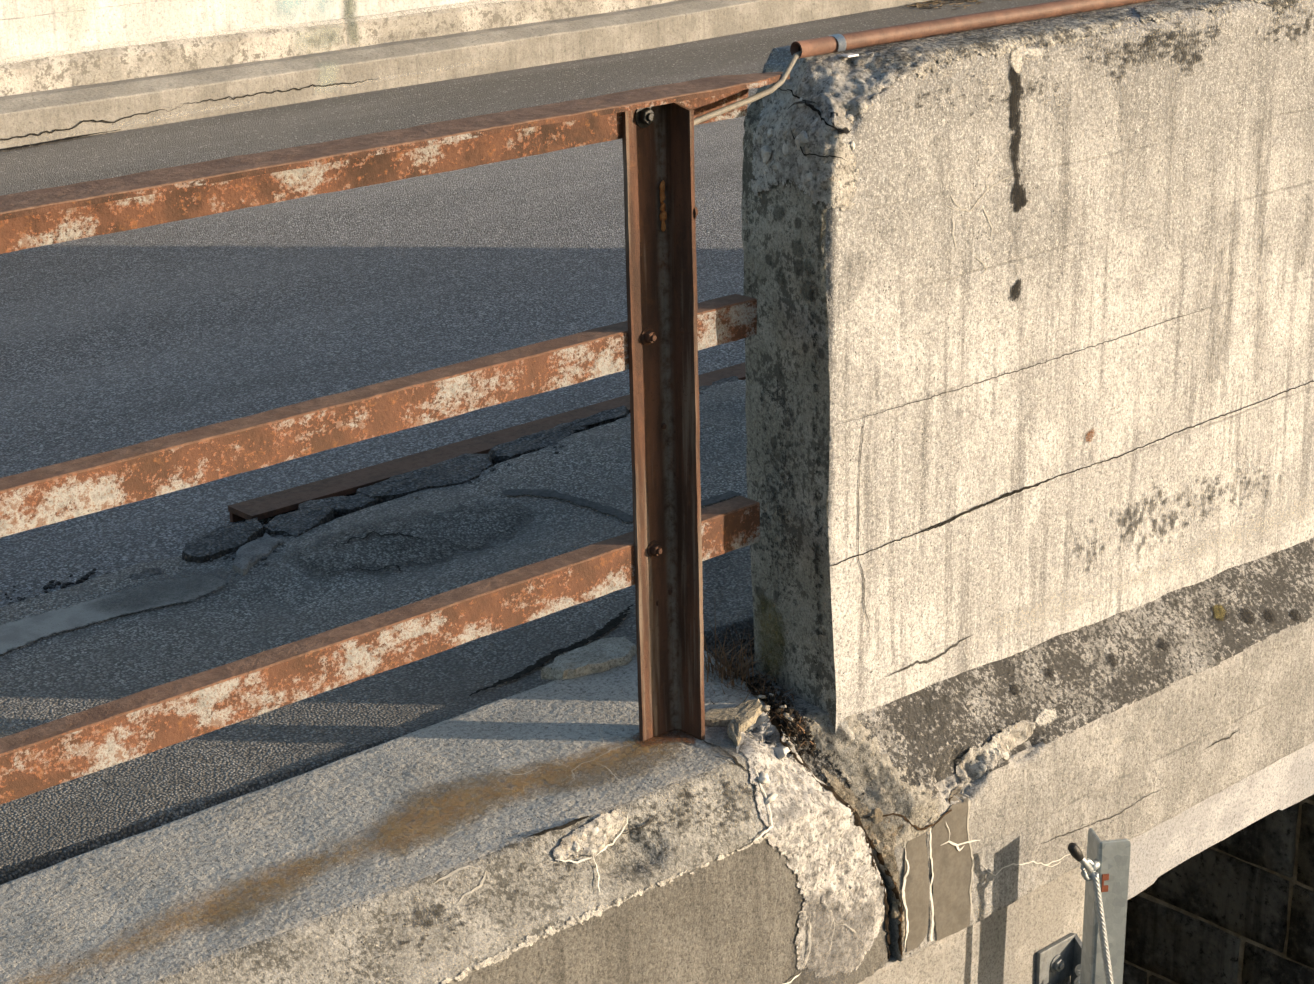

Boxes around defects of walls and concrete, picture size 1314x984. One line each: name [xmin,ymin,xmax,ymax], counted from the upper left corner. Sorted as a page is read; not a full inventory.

crack [0,78,379,140]
spalling [750,0,1304,211]
leakage [1085,16,1226,84]
leakage [1257,8,1313,51]
corrosion [659,180,667,232]
leakage [749,213,824,682]
crack [832,302,1314,639]
leakage [1069,464,1281,582]
crack [884,635,973,677]
spalling [956,709,1056,784]
spalling [437,698,940,984]
crack [740,678,1167,959]